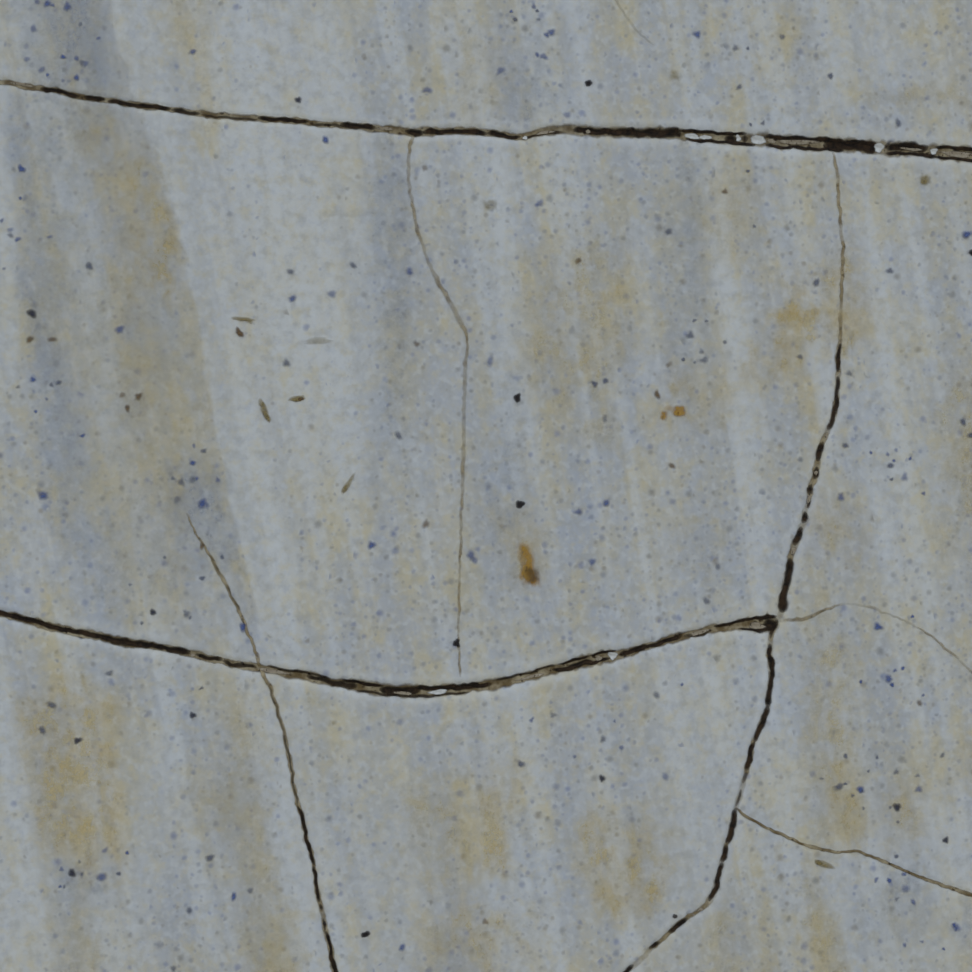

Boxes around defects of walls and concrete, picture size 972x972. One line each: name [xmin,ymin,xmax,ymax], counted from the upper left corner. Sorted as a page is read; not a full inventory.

crack [0,80,972,223]
crack [0,241,972,972]
rust [521,546,536,584]